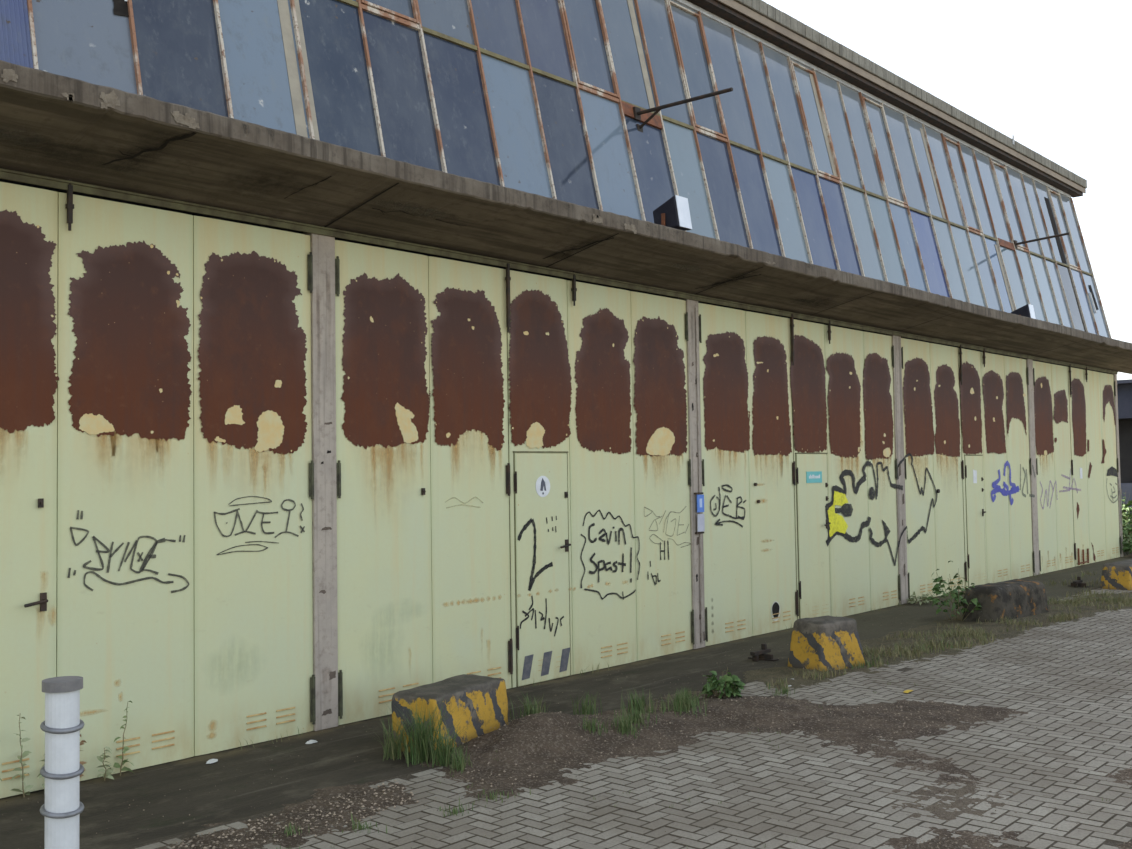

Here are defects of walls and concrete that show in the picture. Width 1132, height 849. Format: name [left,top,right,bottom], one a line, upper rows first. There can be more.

crack [102,132,197,165]